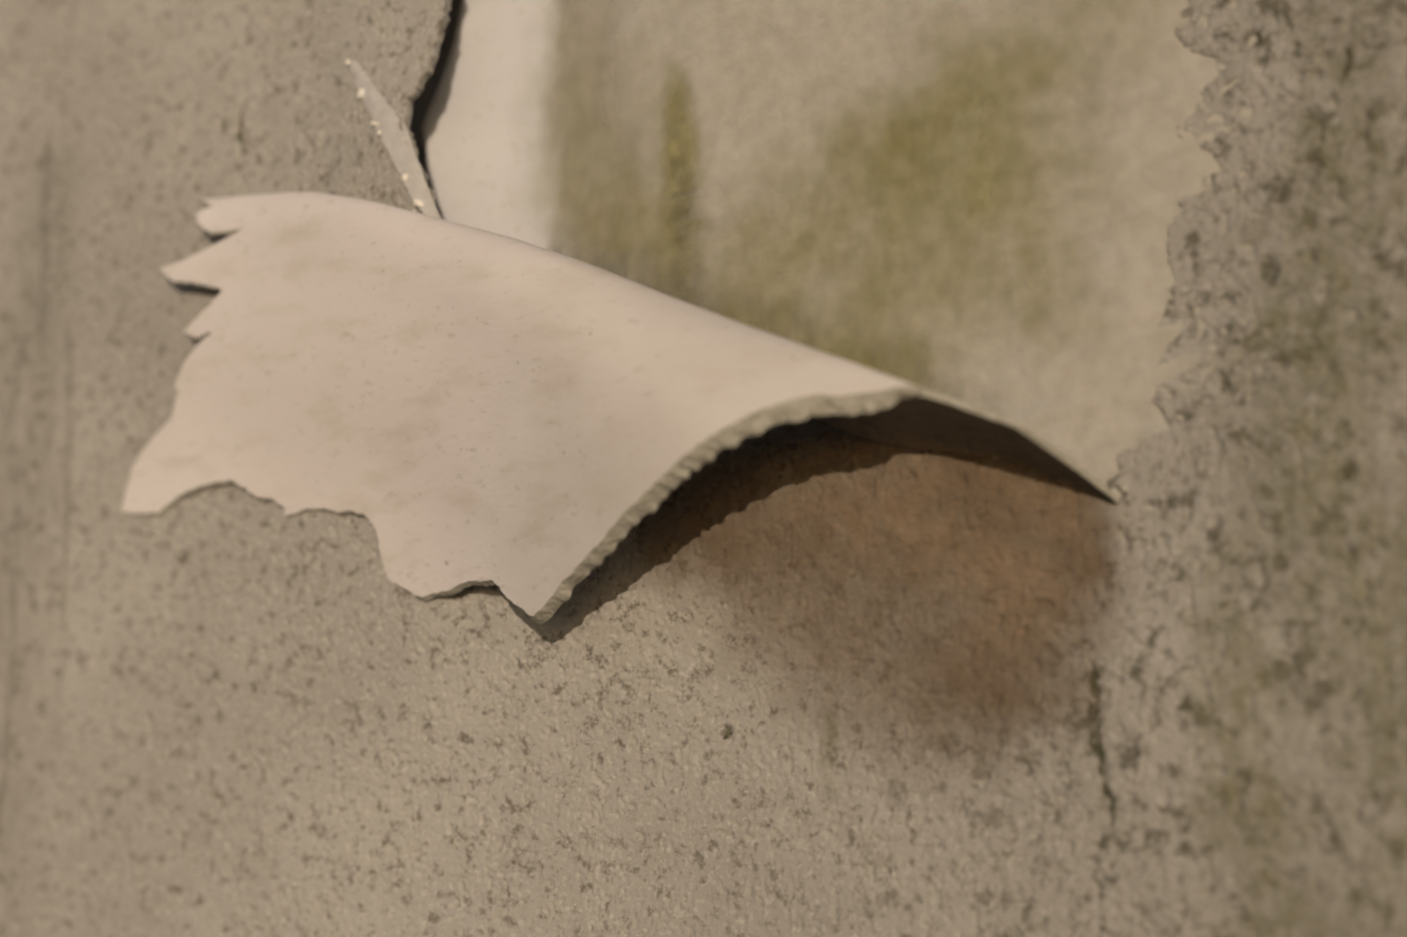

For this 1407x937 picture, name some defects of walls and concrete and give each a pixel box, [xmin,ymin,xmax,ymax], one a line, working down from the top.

flaking render [121,0,1130,624]
damp [559,0,1253,704]
crack [1076,664,1116,936]